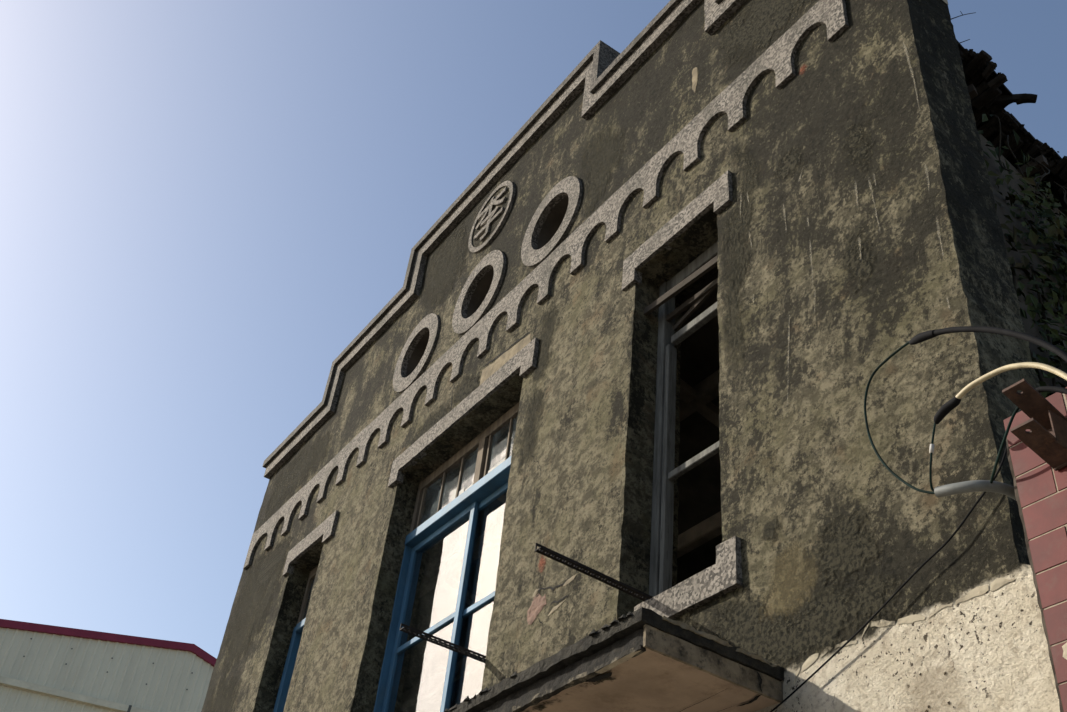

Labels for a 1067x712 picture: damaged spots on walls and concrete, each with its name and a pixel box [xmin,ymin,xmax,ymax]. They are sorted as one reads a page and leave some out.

spalling [527,589,566,624]
leakage [708,508,902,667]